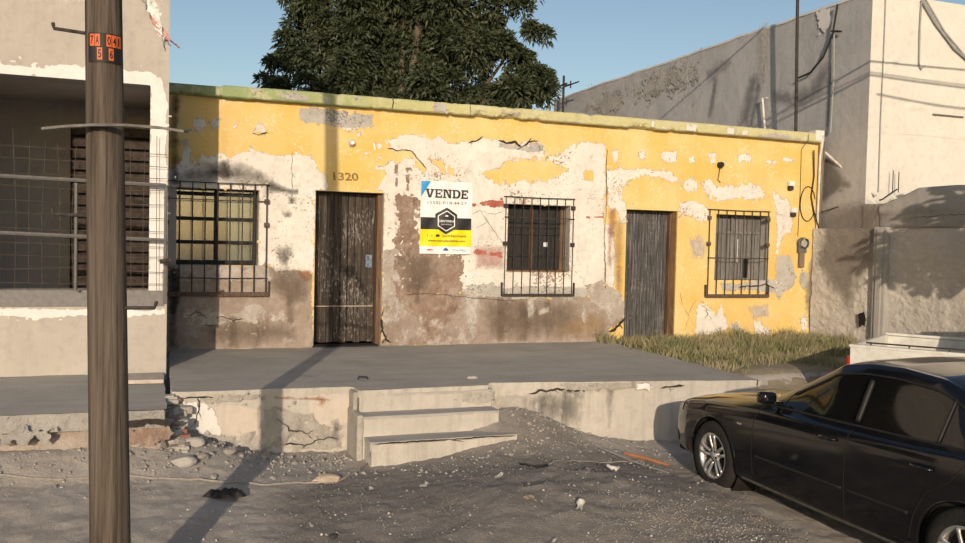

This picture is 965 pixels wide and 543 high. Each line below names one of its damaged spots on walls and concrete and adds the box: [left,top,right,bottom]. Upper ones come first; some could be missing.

spalling [281,90,374,137]
spalling [432,103,449,114]
spalling [727,126,801,140]
peeling [166,113,329,350]
peeling [364,129,809,346]
efflorescence [464,290,478,336]
leakage [492,298,569,330]
spalling [560,381,652,398]
spalling [202,392,344,452]